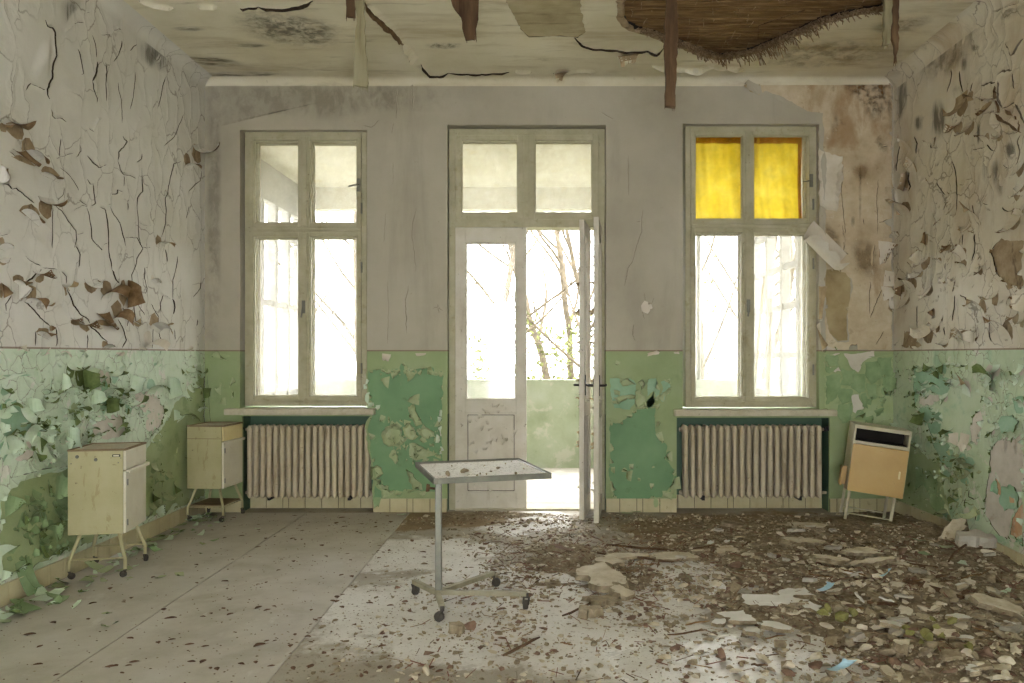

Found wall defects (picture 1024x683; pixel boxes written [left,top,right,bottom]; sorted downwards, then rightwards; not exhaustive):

mould [256,18,326,42]
peeling [502,0,589,38]
crack [364,1,746,78]
peeling [0,115,64,183]
crack [0,0,314,351]
crack [876,0,1024,270]
crack [868,254,894,345]
spalling [744,79,1024,547]
crack [915,292,970,336]
peeling [0,270,211,615]
peeling [363,353,447,508]
peeling [576,374,681,507]